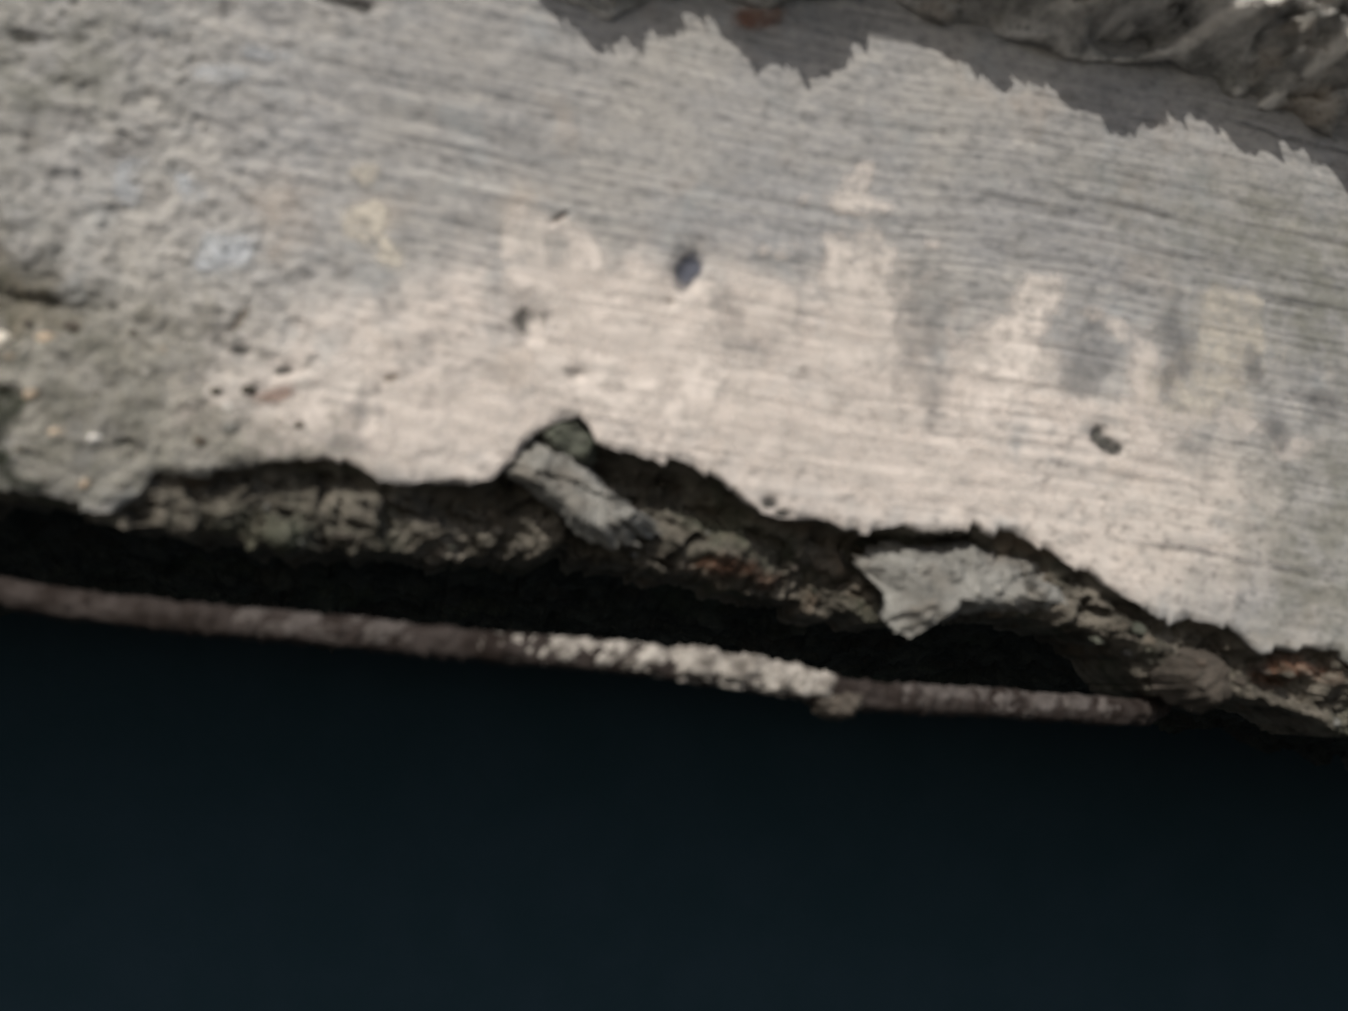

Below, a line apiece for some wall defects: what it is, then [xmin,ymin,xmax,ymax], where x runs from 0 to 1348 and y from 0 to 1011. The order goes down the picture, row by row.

spalling [0,416,1348,737]